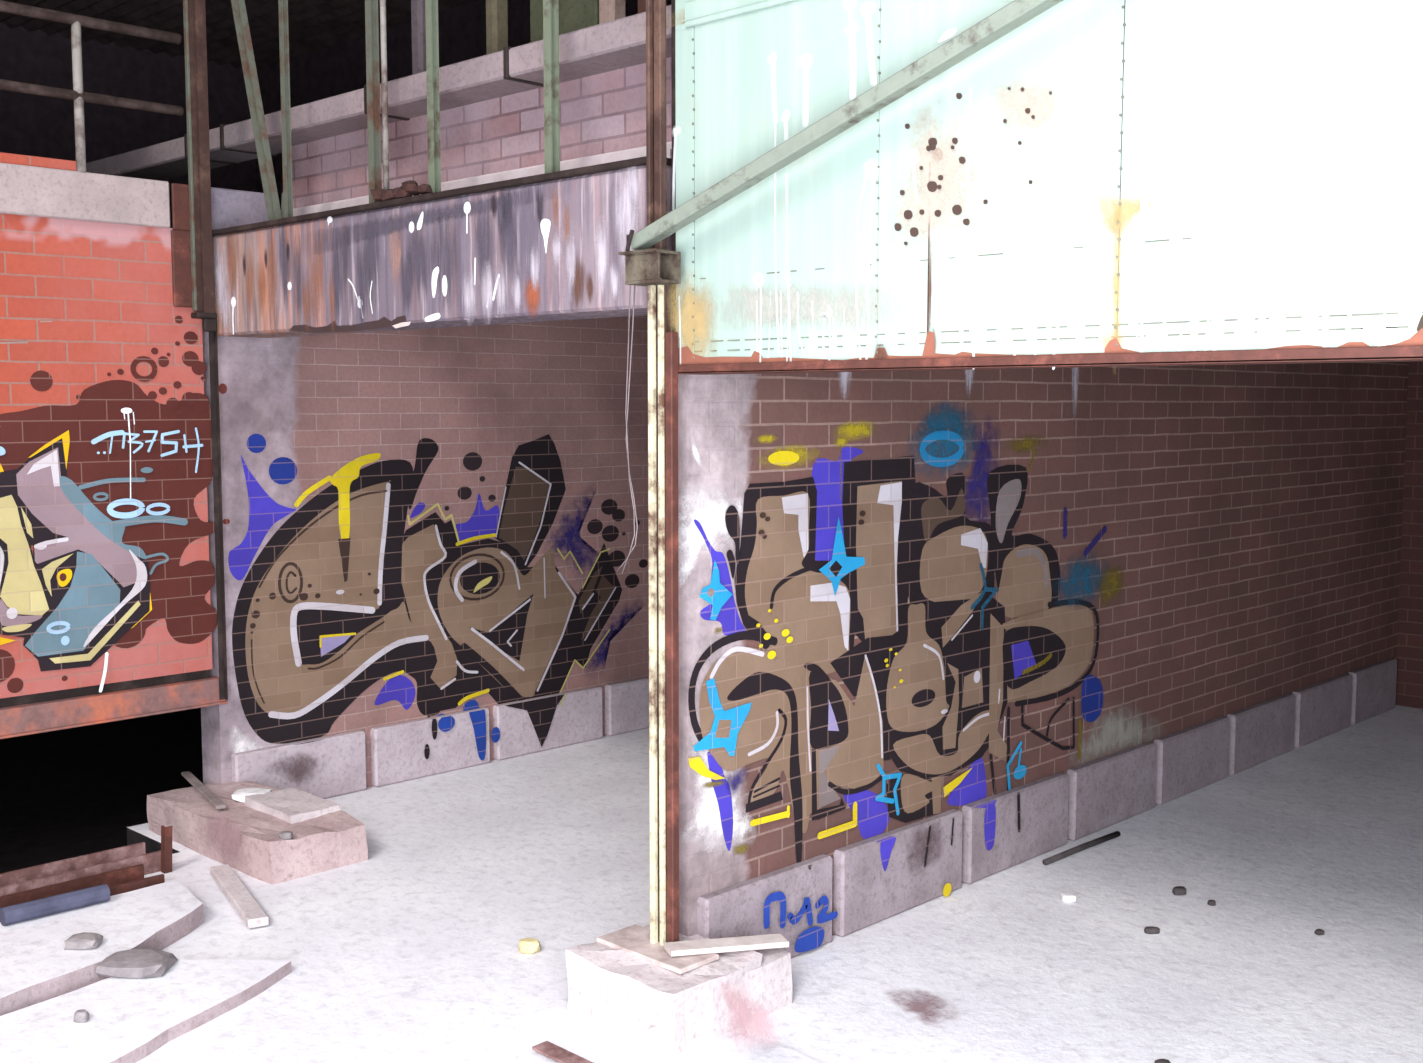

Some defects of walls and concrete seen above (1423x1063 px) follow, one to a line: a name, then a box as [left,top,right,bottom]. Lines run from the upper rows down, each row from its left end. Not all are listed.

rust [527,281,538,310]
rust [572,263,593,304]
rust [1106,201,1141,342]